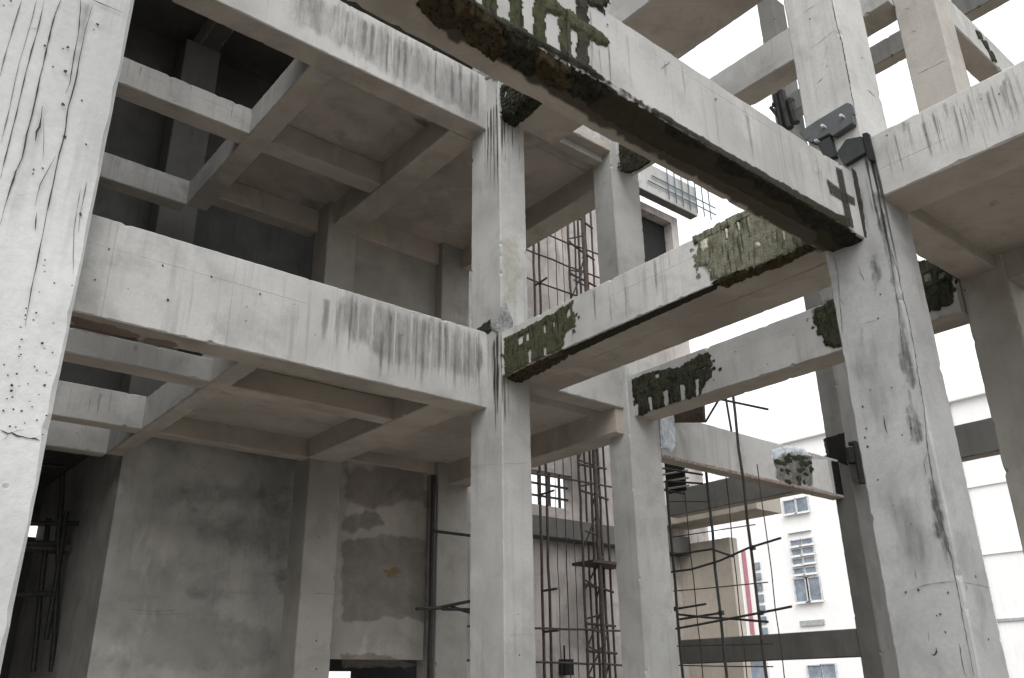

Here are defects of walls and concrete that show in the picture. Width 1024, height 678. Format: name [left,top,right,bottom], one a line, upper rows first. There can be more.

damp [441,27,468,44]
crack [0,0,123,325]
damp [487,107,519,176]
damp [497,29,896,256]
spalling [664,124,862,248]
crack [1,430,40,441]